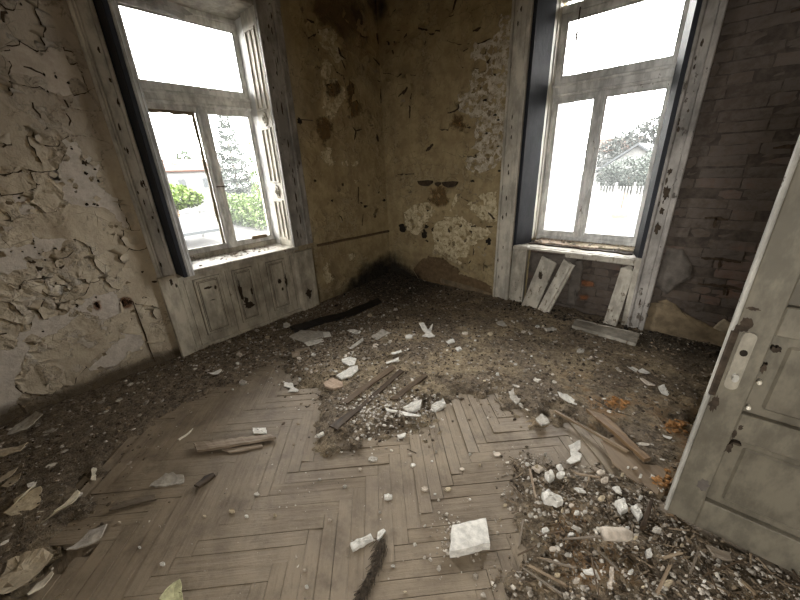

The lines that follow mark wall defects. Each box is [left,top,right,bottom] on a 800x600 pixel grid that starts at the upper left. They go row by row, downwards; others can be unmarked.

crack [0,0,59,118]
peeling [0,36,96,101]
damp [325,80,362,118]
peeling [458,6,522,182]
peeling [30,135,129,239]
peeling [0,220,78,292]
damp [346,254,421,292]
peeling [399,186,507,295]
peeling [0,281,135,415]
peeling [86,332,146,374]